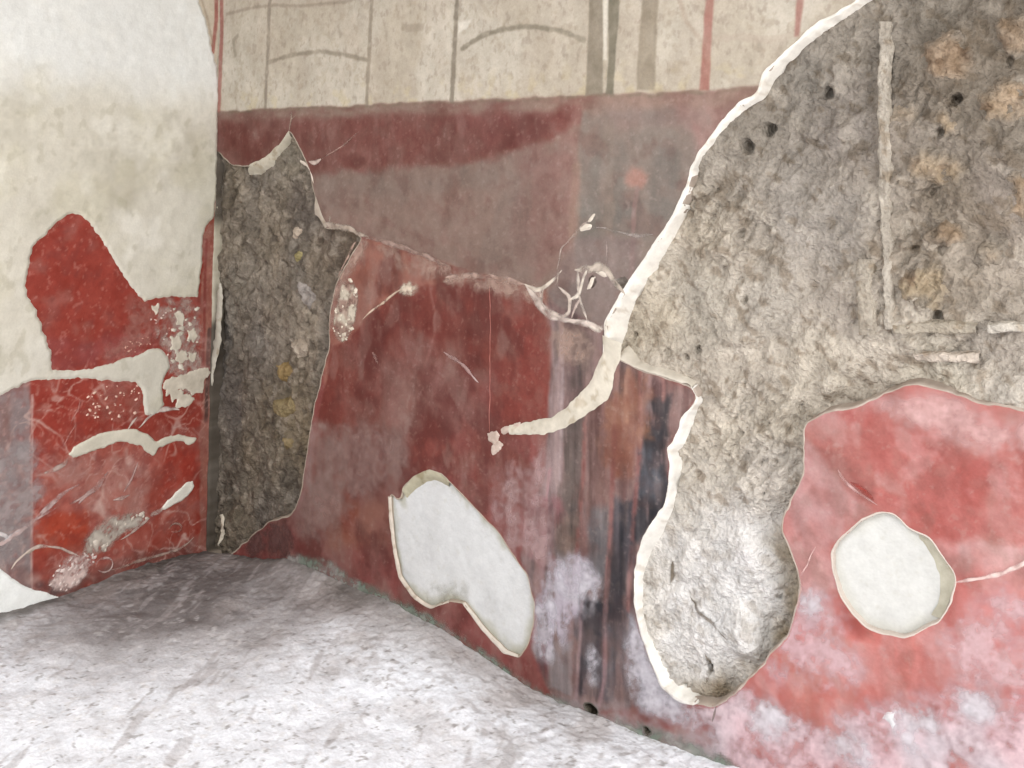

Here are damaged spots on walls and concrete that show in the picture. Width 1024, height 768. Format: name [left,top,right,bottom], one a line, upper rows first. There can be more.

peeling [86,385,140,420]
crack [487,214,653,455]
spalling [150,0,1024,707]
flaking render [0,511,148,613]
damp [535,556,599,660]
damp [783,598,850,674]
crack [960,561,1024,582]
damp [628,624,1024,768]